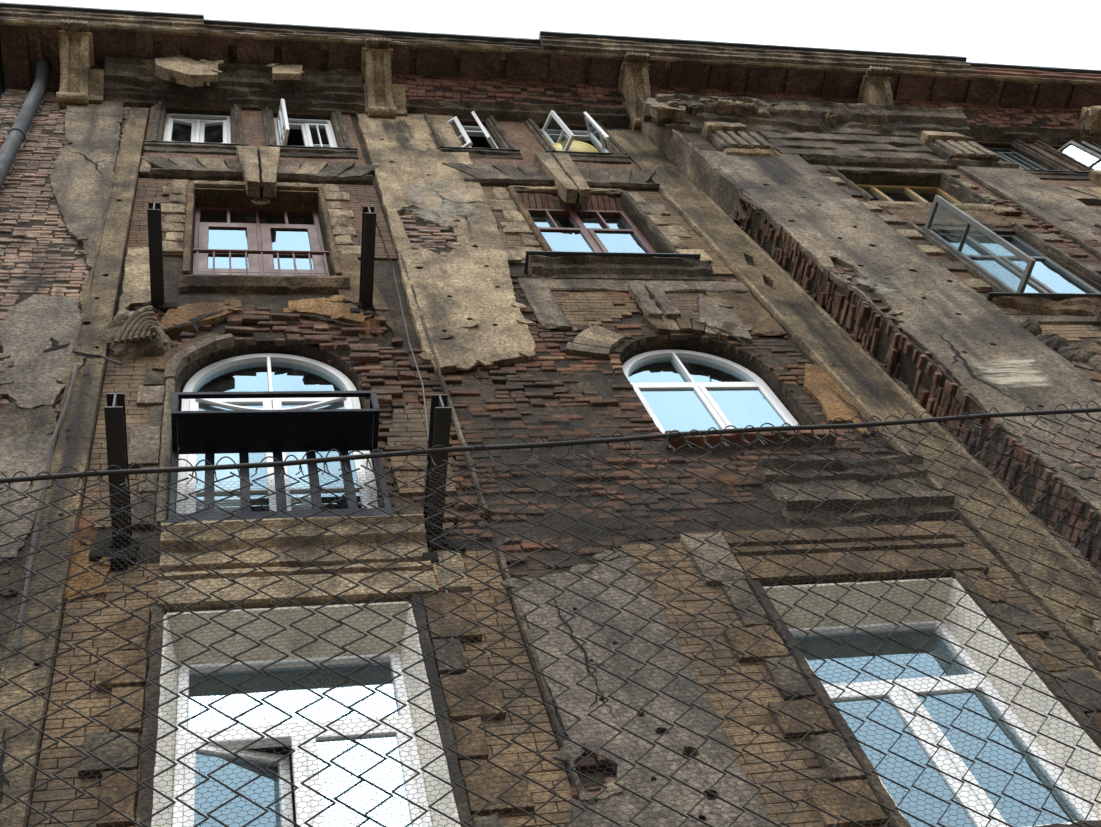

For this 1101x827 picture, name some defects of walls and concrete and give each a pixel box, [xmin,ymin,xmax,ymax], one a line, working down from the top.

crack [67,150,104,177]
flaking render [734,192,1101,583]
crack [939,334,1016,400]
flaking render [157,114,890,827]
crack [550,596,617,720]